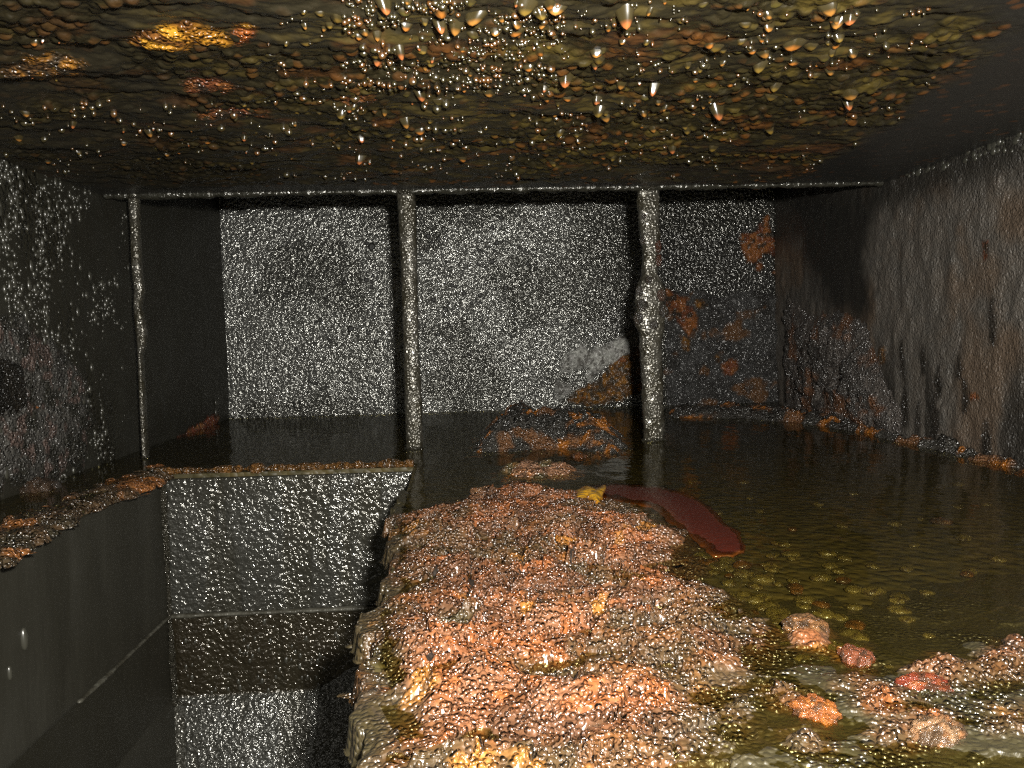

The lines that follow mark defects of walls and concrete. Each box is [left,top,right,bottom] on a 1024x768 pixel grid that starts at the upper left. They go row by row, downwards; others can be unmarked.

rust [4,53,82,80]
rust [186,78,236,93]
rust [739,215,775,274]
rust [666,289,705,351]
rust [464,347,642,484]
leakage [899,341,941,439]
rust [0,458,414,569]